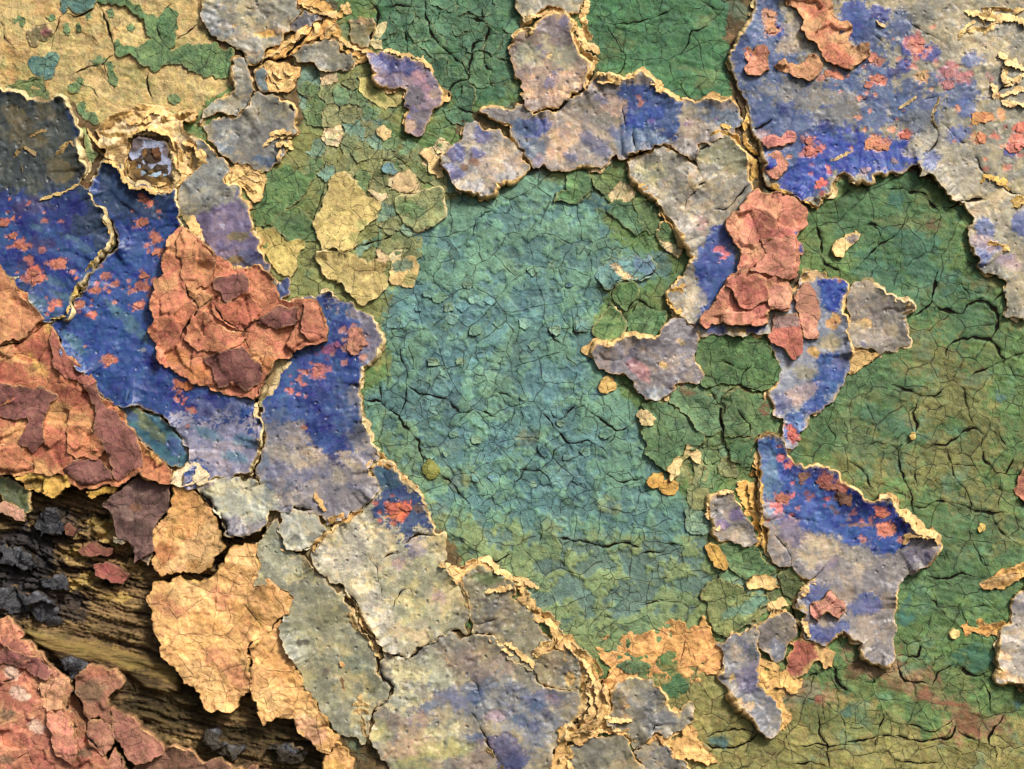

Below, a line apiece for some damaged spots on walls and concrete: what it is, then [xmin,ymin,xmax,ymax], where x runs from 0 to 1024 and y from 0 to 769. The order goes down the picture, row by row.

crack [236,24,313,111]
crack [369,0,495,114]
peeling [348,0,1024,323]
peeling [0,0,423,577]
peeling [146,121,836,769]
crack [364,328,641,506]
crack [702,338,760,467]
peeling [668,268,943,669]
crack [825,270,1024,543]
crack [365,533,513,607]
crack [539,525,684,621]
crack [786,641,1005,766]